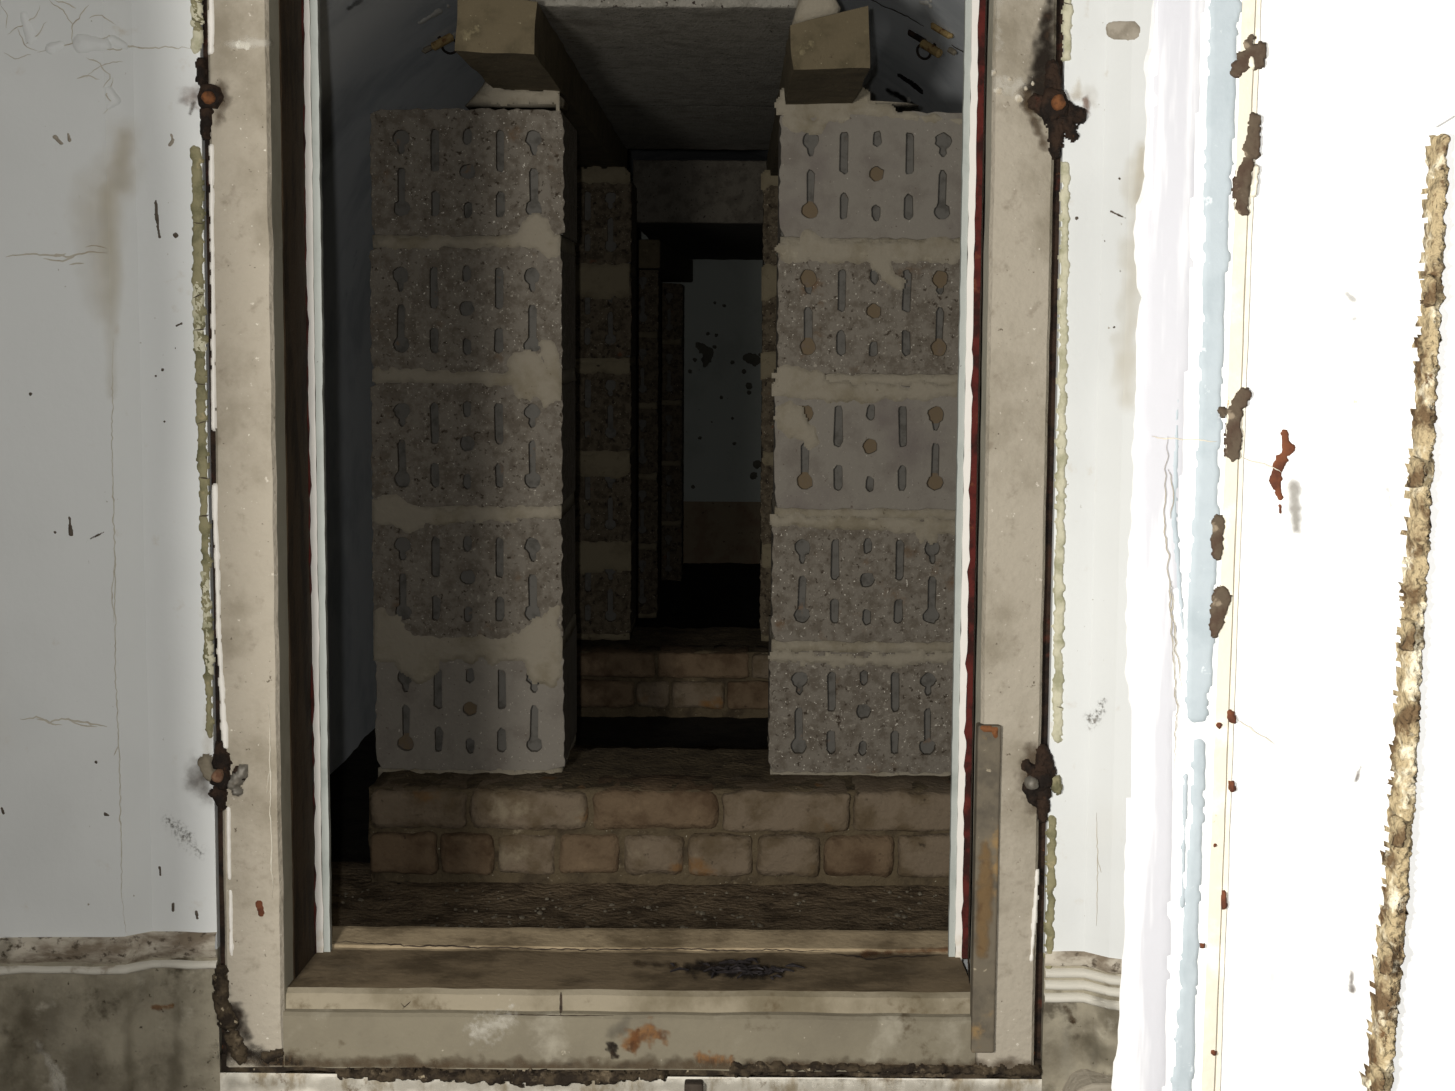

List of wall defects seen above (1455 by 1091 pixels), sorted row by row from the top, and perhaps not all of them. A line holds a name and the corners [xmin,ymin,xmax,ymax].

crack [0,0,191,114]
corrosion [1269,429,1299,530]
peeling [1106,0,1242,1091]
flaking render [1359,133,1450,1091]
corrosion [605,1025,664,1058]